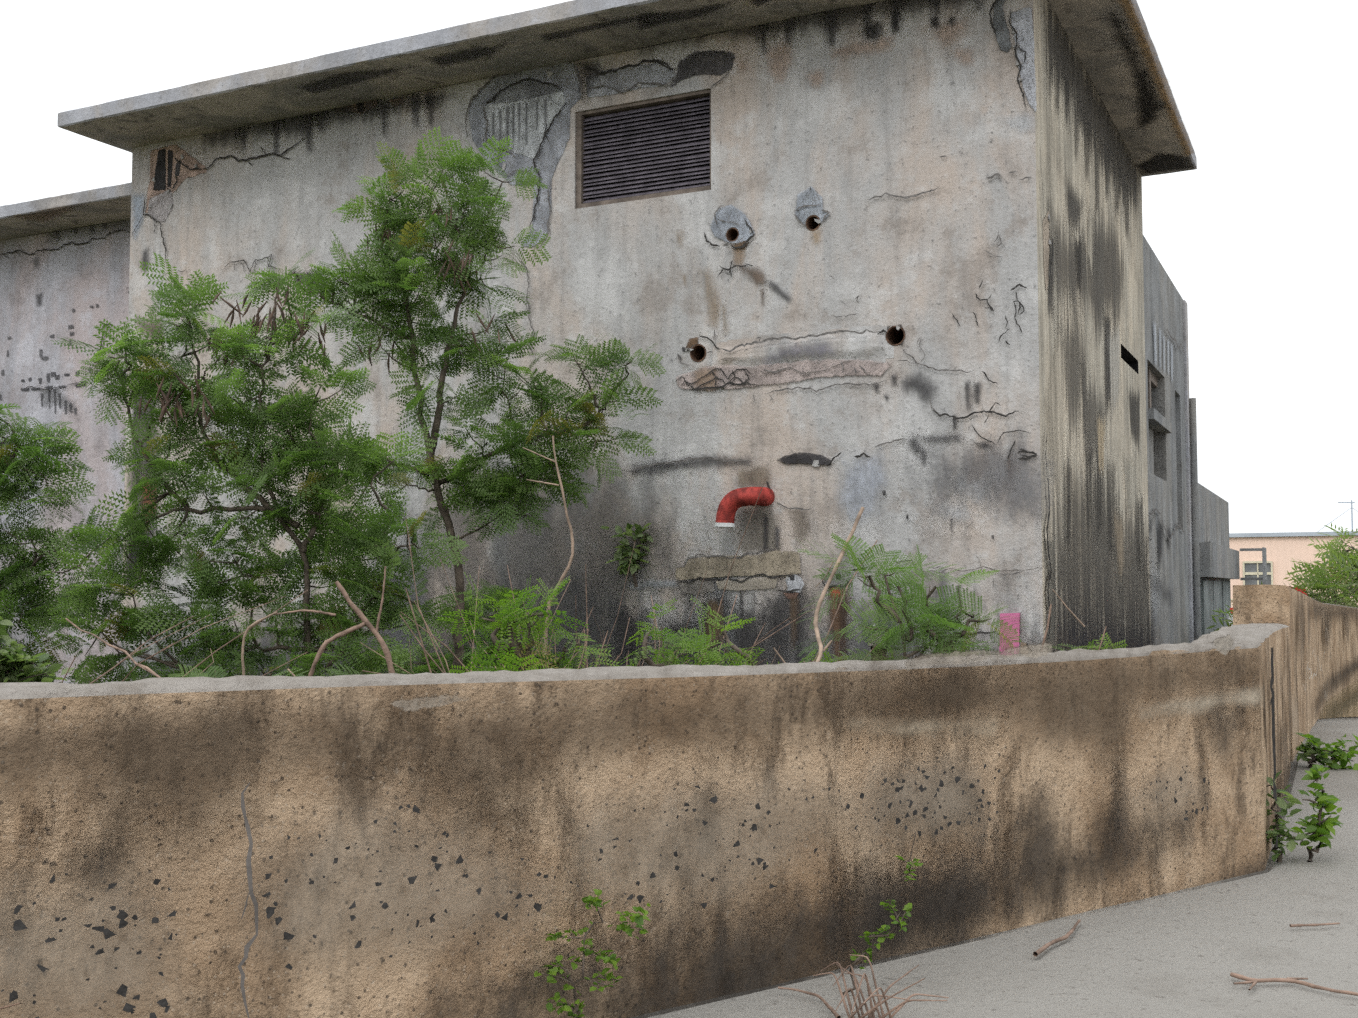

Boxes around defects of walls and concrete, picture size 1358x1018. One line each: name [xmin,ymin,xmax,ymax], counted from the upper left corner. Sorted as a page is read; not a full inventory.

leakage [670,35,735,88]
leakage [735,0,961,43]
leakage [1046,0,1193,205]
crack [203,138,303,169]
flaking render [465,59,677,248]
crack [868,155,947,200]
leakage [719,260,790,302]
crack [952,168,1053,345]
leakage [619,457,812,551]
crack [753,336,1052,643]
leakage [894,184,1241,743]
leakage [143,577,928,678]